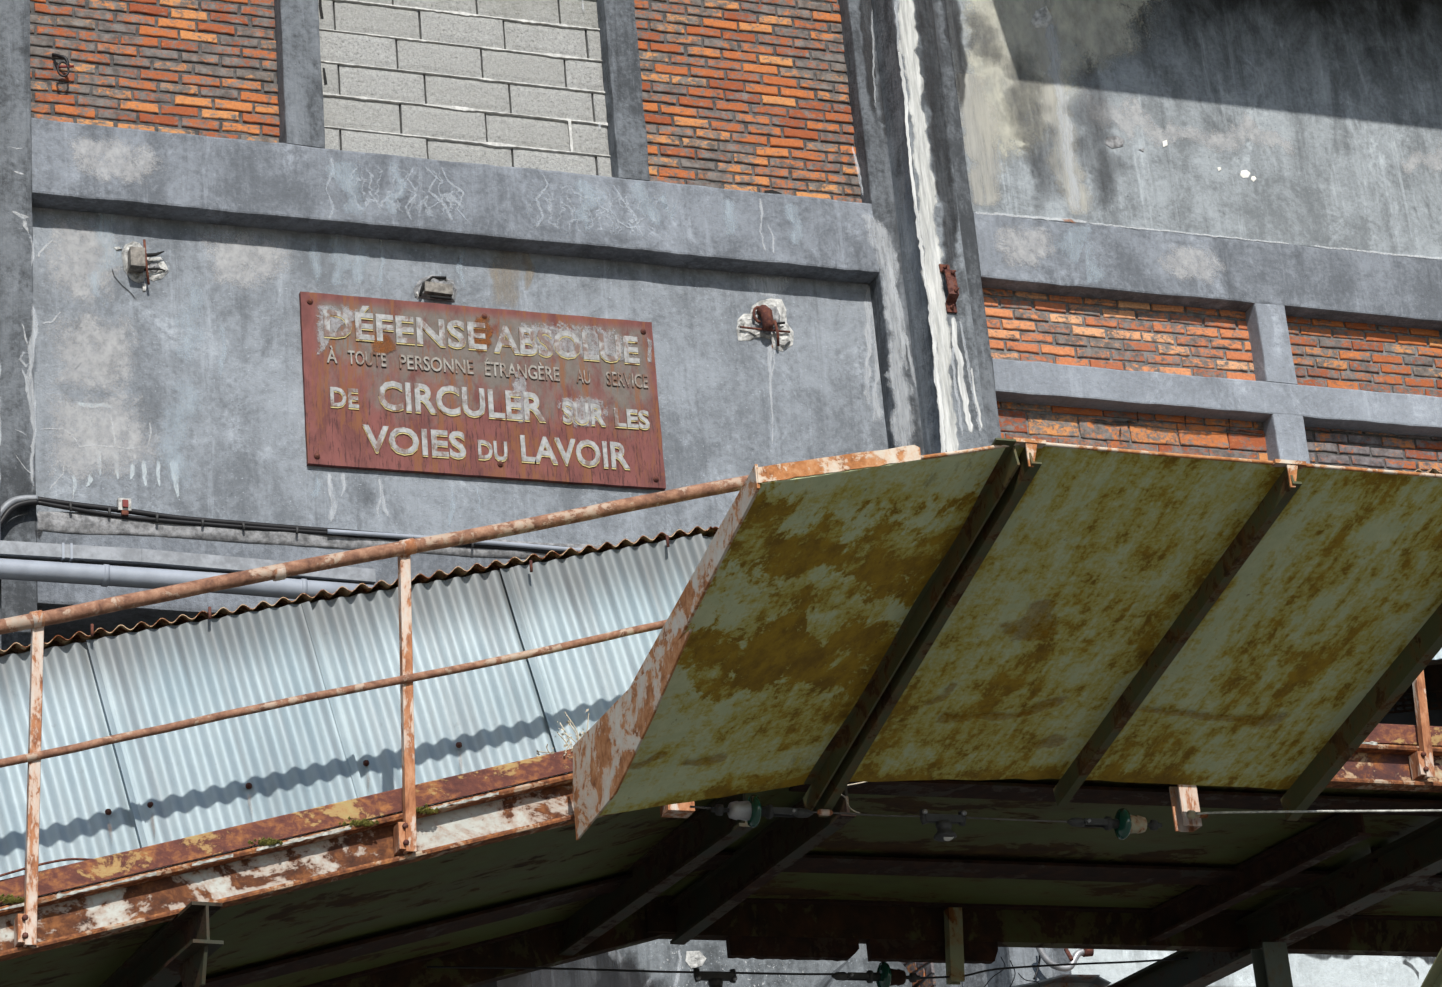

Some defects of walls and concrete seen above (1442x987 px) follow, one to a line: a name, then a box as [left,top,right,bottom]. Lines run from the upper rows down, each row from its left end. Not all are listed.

leakage [859,0,887,135]
leakage [1027,0,1087,211]
spalling [113,241,169,291]
spalling [736,298,794,351]
leakage [864,227,911,440]
leakage [896,0,1000,453]